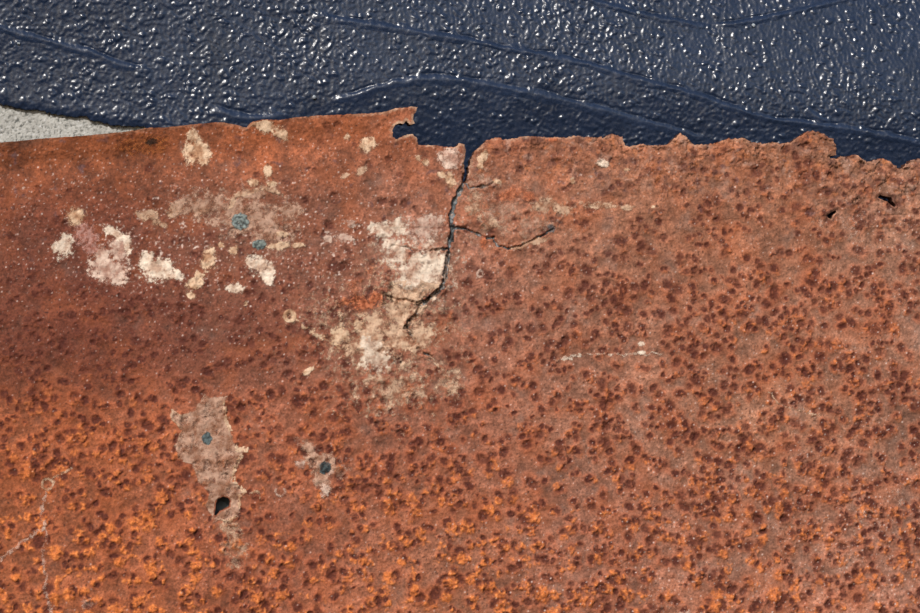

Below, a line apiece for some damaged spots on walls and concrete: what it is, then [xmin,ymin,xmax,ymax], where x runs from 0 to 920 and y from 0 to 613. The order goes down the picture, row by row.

corrosion [115,136,168,154]
peeling [182,128,213,166]
peeling [147,186,305,251]
crack [403,182,550,356]
corrosion [341,291,383,310]
peeling [170,395,260,554]
peeling [296,440,340,497]
corrosion [214,497,229,515]